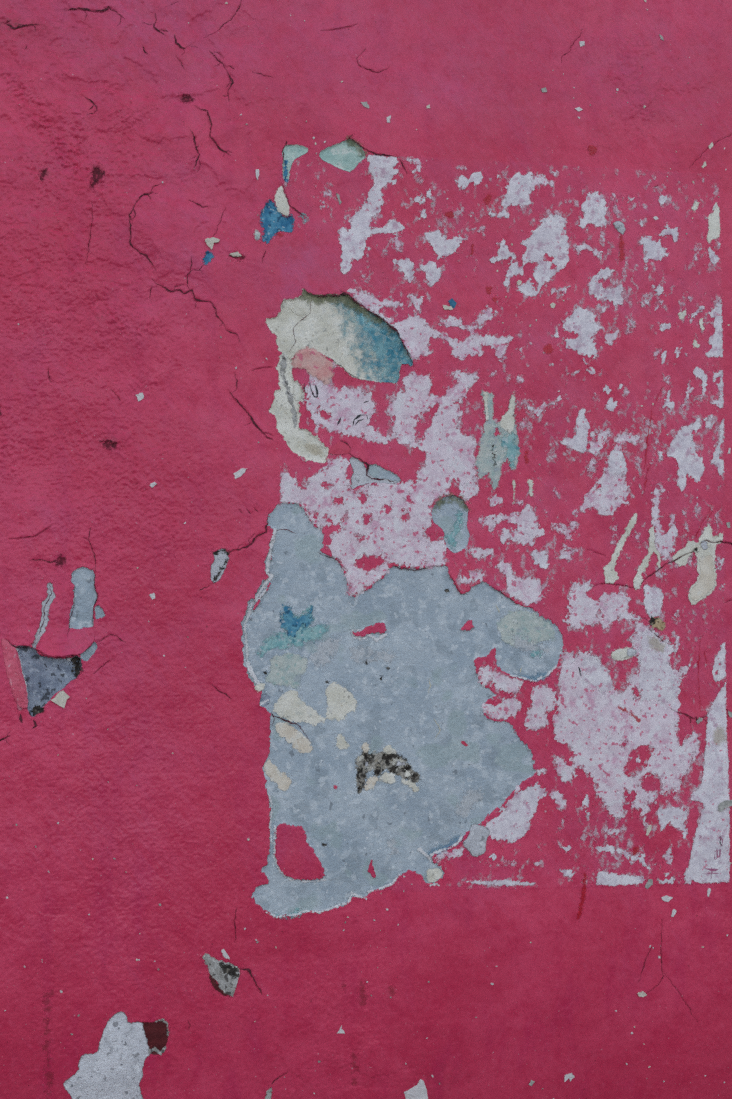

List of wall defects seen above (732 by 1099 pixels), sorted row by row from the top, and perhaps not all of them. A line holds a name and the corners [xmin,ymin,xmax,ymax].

crack [3,20,38,49]
crack [69,2,271,167]
peeling [253,134,392,244]
crack [129,185,240,342]
peeling [265,289,414,489]
peeling [431,483,470,553]
crack [593,536,732,588]
peeling [2,555,105,729]
peeling [241,502,564,920]
peeling [202,949,262,997]
peeling [63,1011,169,1099]
peeling [404,1079,428,1099]